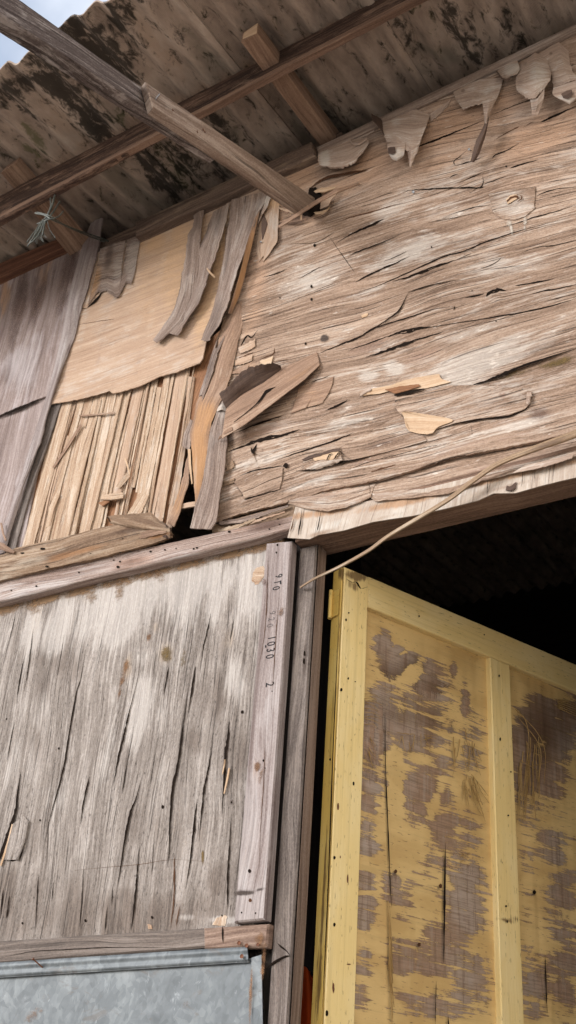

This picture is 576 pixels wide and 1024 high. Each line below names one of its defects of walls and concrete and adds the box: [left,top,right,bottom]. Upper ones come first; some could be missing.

peeling [318,131,375,169]
peeling [201,192,271,341]
crack [229,93,576,500]
spalling [22,366,195,546]
peeling [506,454,574,491]
crack [259,562,280,709]
crack [0,612,234,958]
crack [258,757,266,864]
crack [384,734,392,907]
peeling [355,628,495,1019]
crack [440,846,448,959]
peeling [512,684,576,1024]